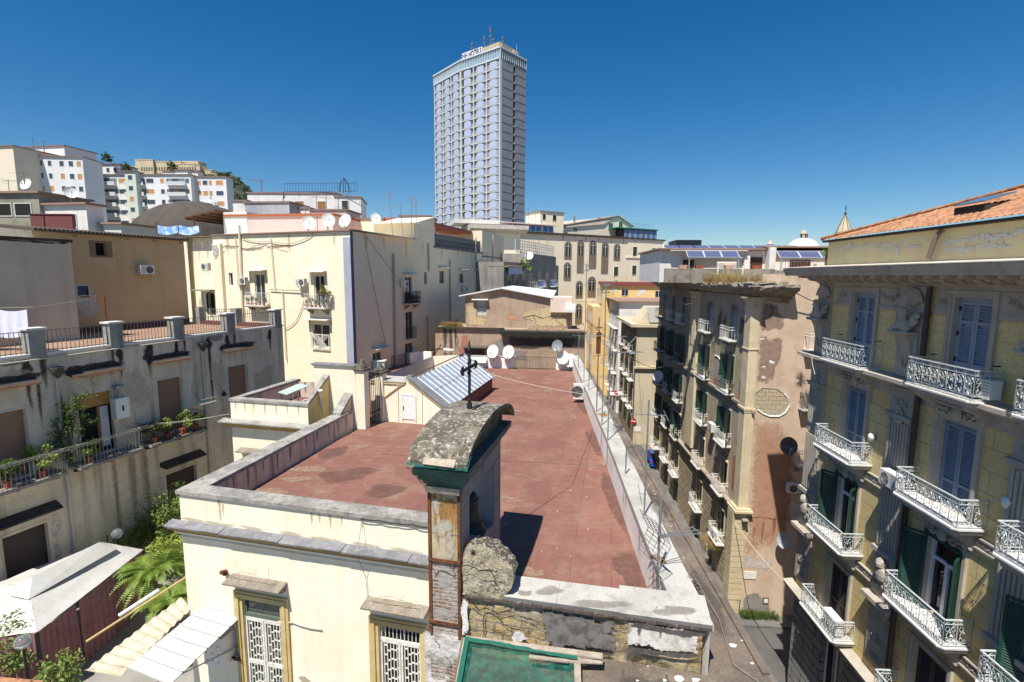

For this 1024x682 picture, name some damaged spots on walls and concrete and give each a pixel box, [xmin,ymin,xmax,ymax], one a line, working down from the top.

water stain [143,340,189,372]
flaking render [754,305,790,417]
water stain [322,468,371,483]
water stain [367,485,405,497]
peeling [433,499,457,589]
spalling [433,598,603,682]
peeling [626,623,702,653]